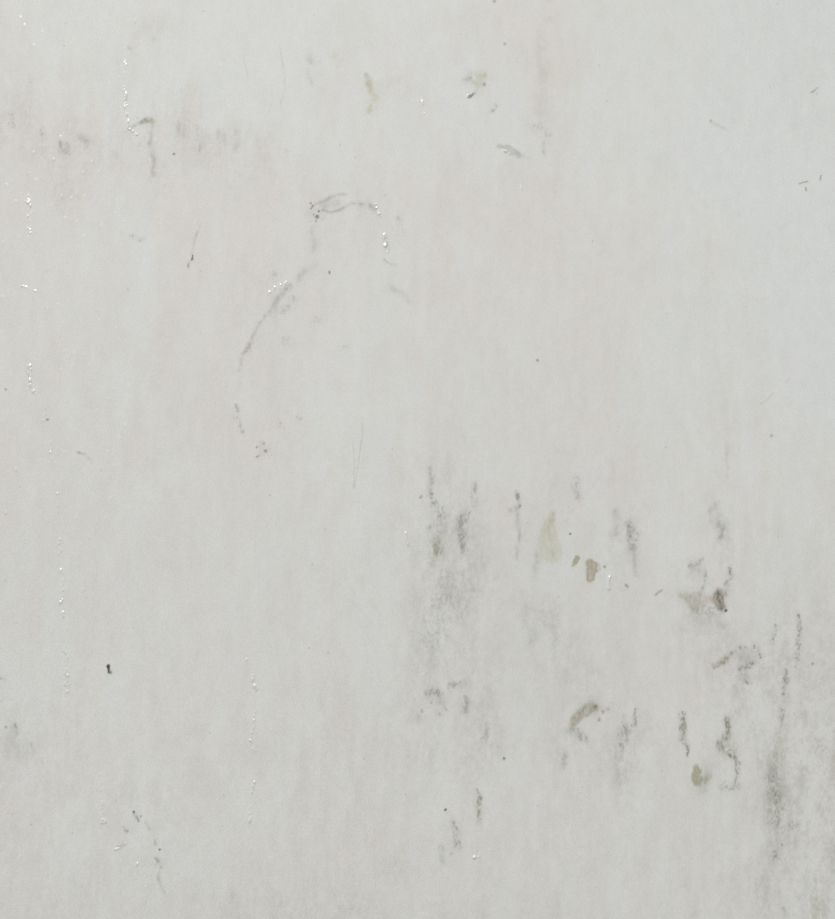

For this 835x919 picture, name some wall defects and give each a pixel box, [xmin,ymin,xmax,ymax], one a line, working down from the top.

damp [506,488,602,584]
damp [607,504,643,581]
damp [407,463,484,724]
damp [673,551,737,635]
damp [710,621,779,684]
damp [470,786,486,828]
damp [557,694,640,796]
damp [675,707,744,801]
damp [748,612,835,919]